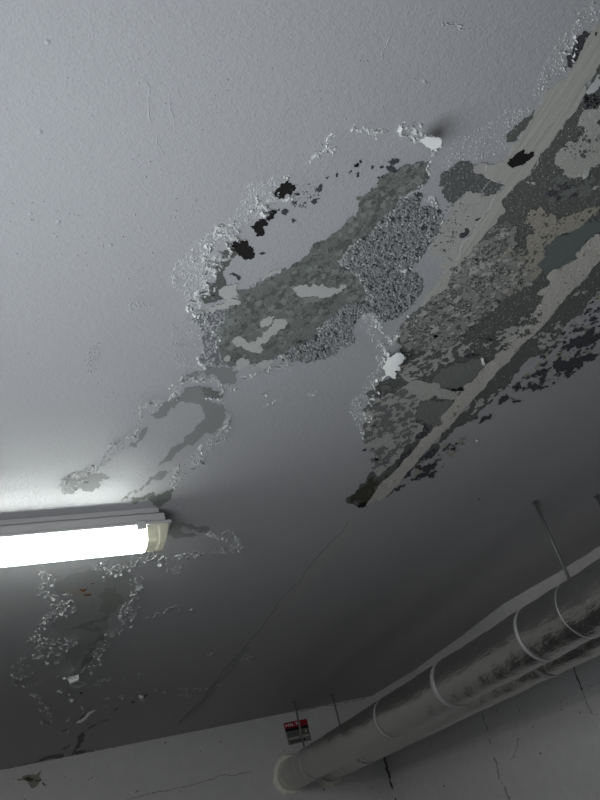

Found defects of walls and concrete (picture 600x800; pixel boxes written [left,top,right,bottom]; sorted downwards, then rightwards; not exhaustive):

spalling [539,27,597,87]
leakage [583,94,600,109]
leakage [564,130,600,160]
leakage [186,161,600,470]
peeling [57,463,110,495]
leakage [350,481,379,508]
peeling [5,522,245,789]
crack [383,757,396,800]